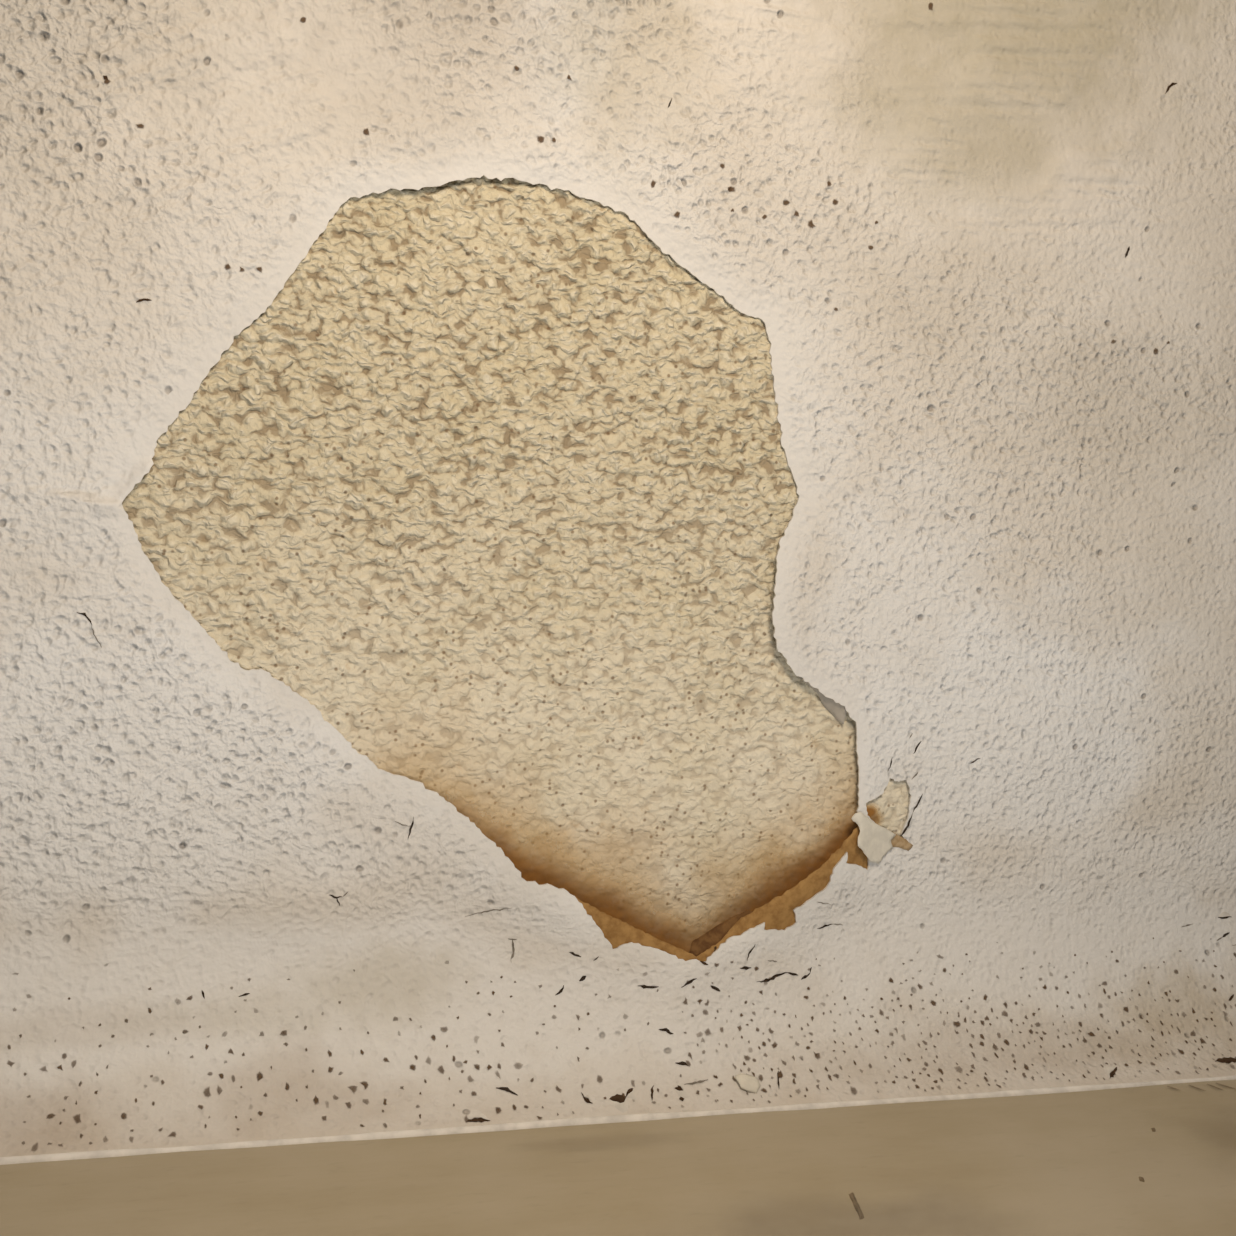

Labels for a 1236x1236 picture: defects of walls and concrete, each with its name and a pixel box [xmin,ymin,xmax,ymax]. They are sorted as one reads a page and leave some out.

peeling [122,175,913,1014]